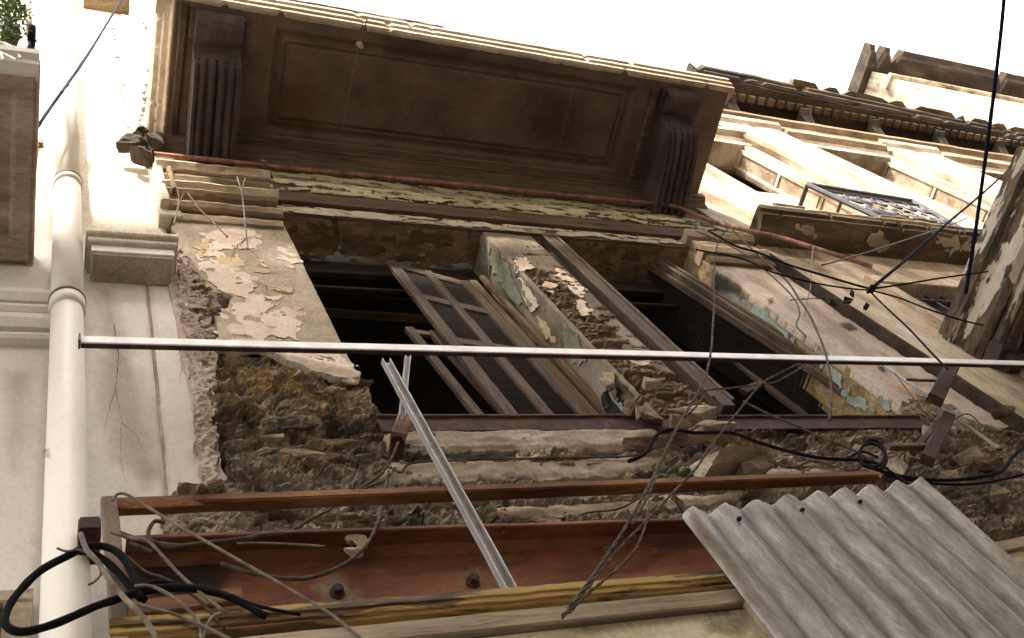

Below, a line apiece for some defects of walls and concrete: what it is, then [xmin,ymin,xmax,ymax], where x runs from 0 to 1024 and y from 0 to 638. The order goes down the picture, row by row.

peeling [795,224,818,240]
peeling [866,230,897,253]
peeling [935,236,972,256]
peeling [712,280,795,344]
spalling [176,169,744,493]
crack [104,325,145,483]
spalling [251,503,428,531]